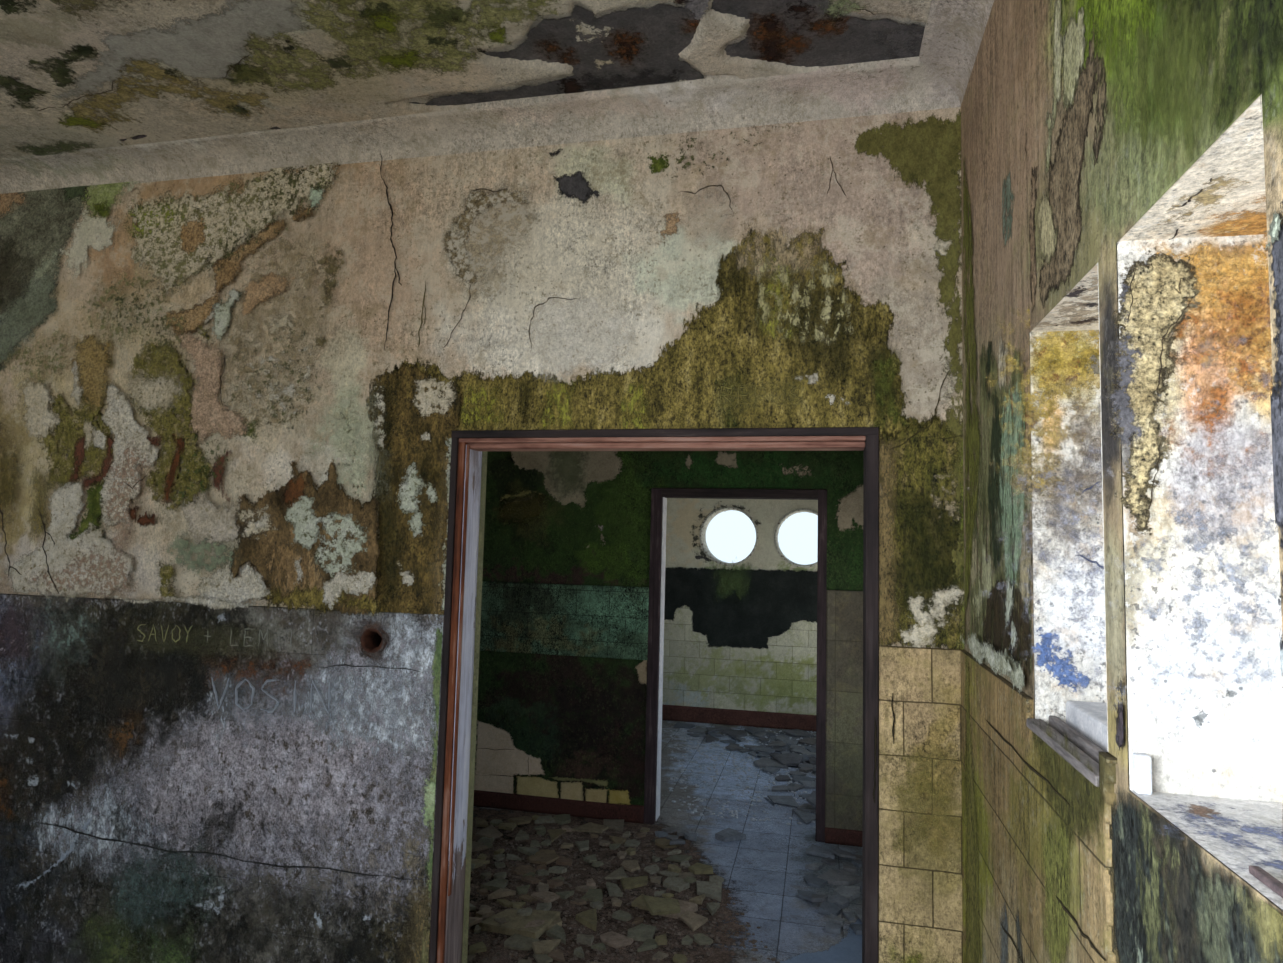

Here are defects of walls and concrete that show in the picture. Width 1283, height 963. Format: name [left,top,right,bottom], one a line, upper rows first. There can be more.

spalling [409,0,924,106]
crack [380,153,426,349]
corrosion [1155,242,1273,474]
peeling [4,383,381,616]
peeling [664,501,817,649]
corrosion [1175,511,1267,646]
leakage [0,386,451,963]
corrosion [1192,708,1209,733]
crack [30,820,421,880]
leakage [1032,729,1103,963]
crack [1056,897,1105,961]
leakage [1249,892,1283,959]